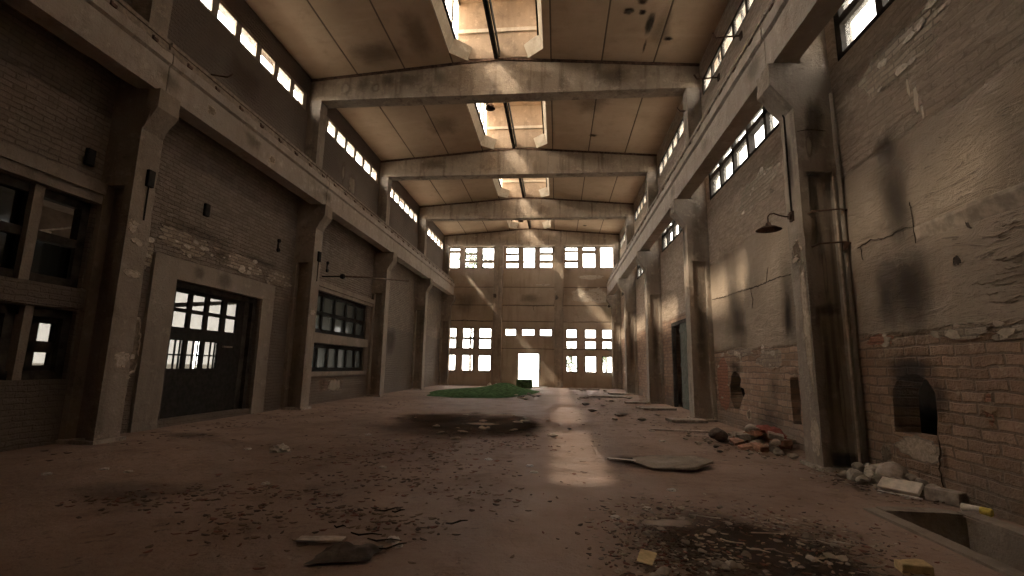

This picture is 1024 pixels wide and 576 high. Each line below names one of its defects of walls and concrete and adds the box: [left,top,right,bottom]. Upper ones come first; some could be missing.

damp [624,0,654,51]
flaking render [156,222,265,276]
crack [858,202,916,260]
crack [712,269,791,305]
flaking render [930,318,1024,343]
flaking render [716,353,731,414]
flaking render [881,435,944,465]
crack [937,440,945,487]